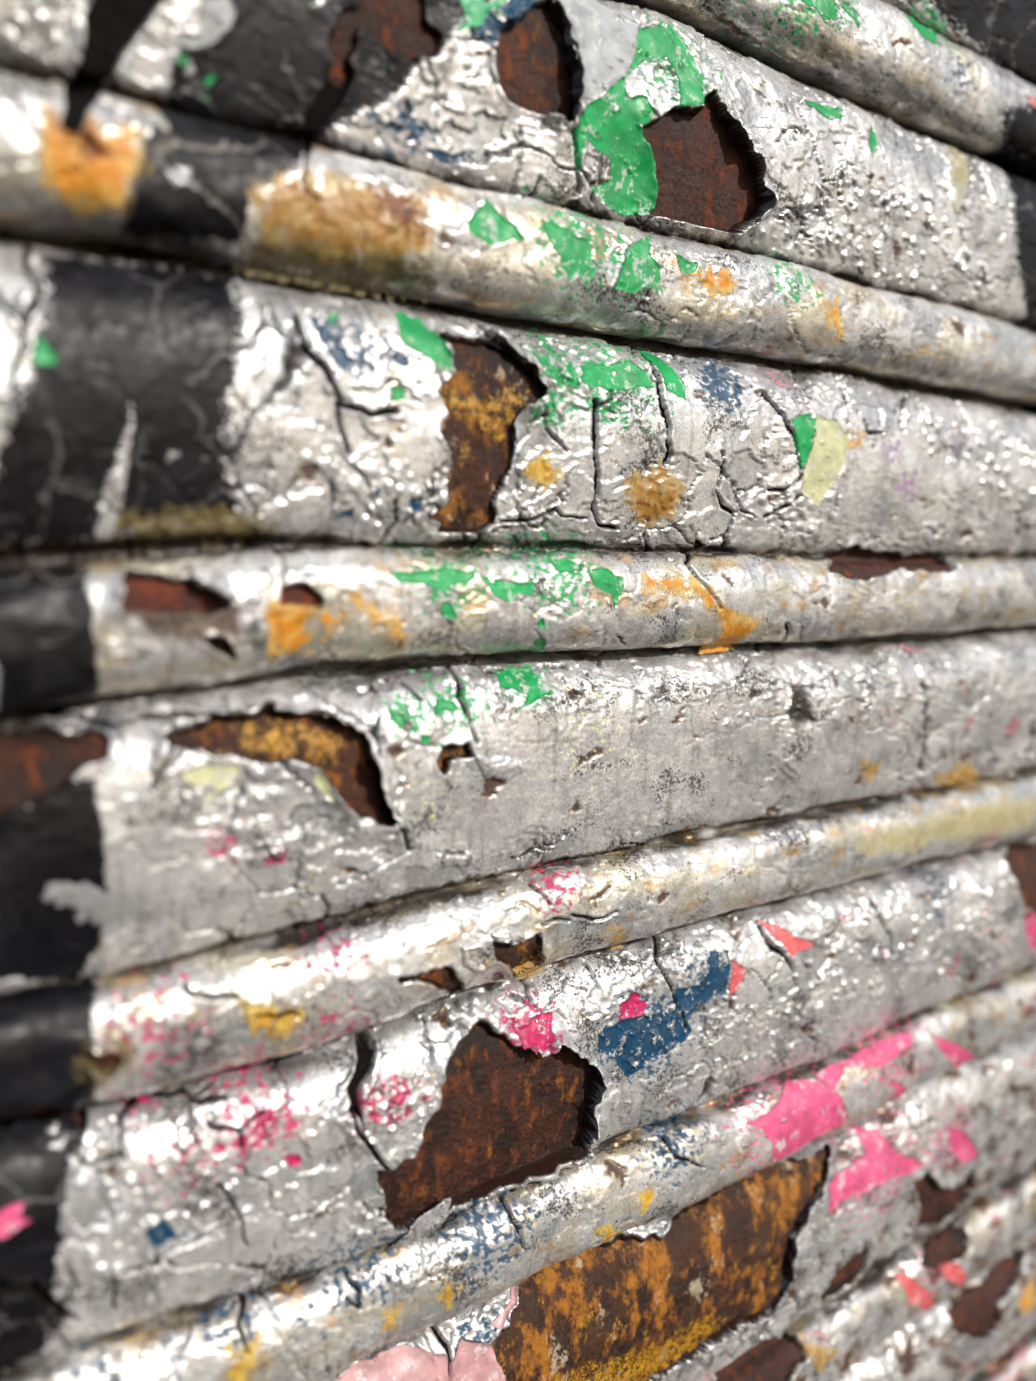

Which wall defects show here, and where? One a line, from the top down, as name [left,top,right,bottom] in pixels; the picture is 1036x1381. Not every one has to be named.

peeling [560,0,705,216]
crack [270,312,395,453]
corrosion [430,330,567,529]
crack [493,398,615,529]
crack [652,370,669,465]
peeling [63,685,405,733]
corrosion [166,711,404,833]
peeling [599,950,746,1077]
crack [92,1089,264,1163]
peeling [361,1038,438,1170]
corrosion [377,1026,608,1219]
corrosion [492,1140,839,1381]